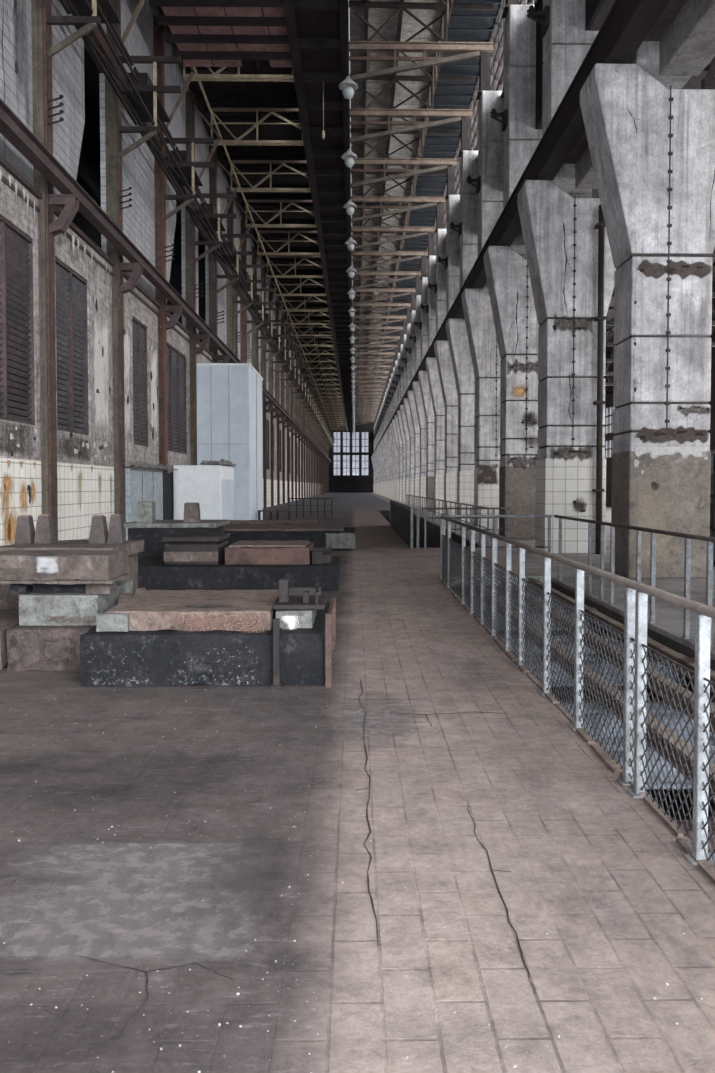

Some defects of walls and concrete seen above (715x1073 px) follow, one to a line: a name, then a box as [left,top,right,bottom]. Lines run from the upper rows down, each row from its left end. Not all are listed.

spalling [637,259,711,279]
spalling [552,315,592,334]
peeling [0,424,37,457]
spalling [634,406,710,490]
corrosion [3,460,36,544]
crack [358,680,378,946]
crack [467,808,535,994]